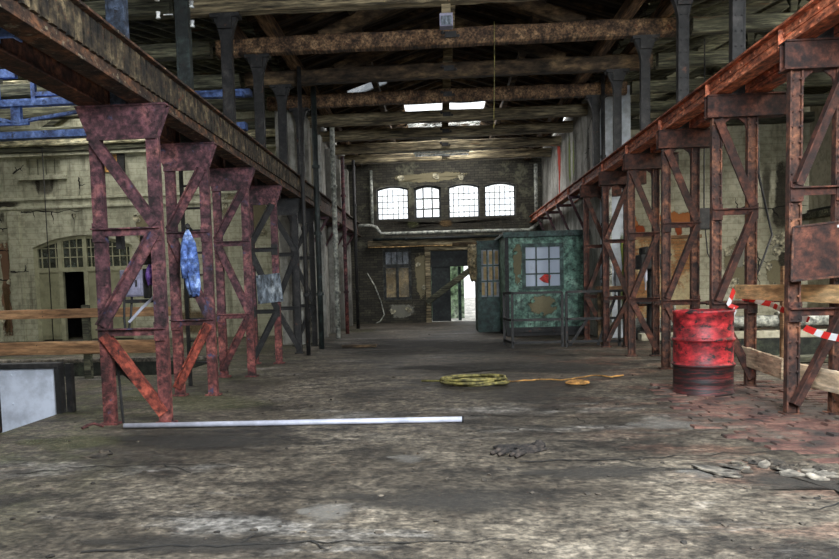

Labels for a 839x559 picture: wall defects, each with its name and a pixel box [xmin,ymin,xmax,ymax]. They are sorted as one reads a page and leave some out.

spalling [635,456,839,509]